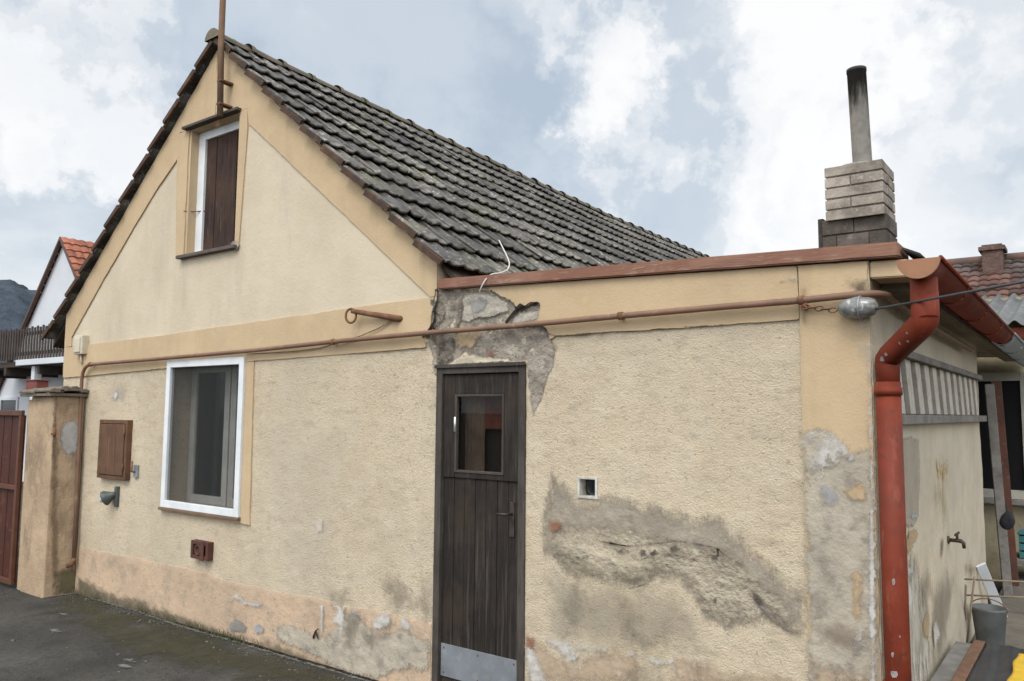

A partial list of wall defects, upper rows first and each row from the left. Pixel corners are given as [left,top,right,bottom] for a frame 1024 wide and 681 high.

spalling [426,289,556,414]
peeling [60,421,78,459]
spalling [543,396,898,681]
spalling [276,605,431,678]
peeling [526,646,546,681]